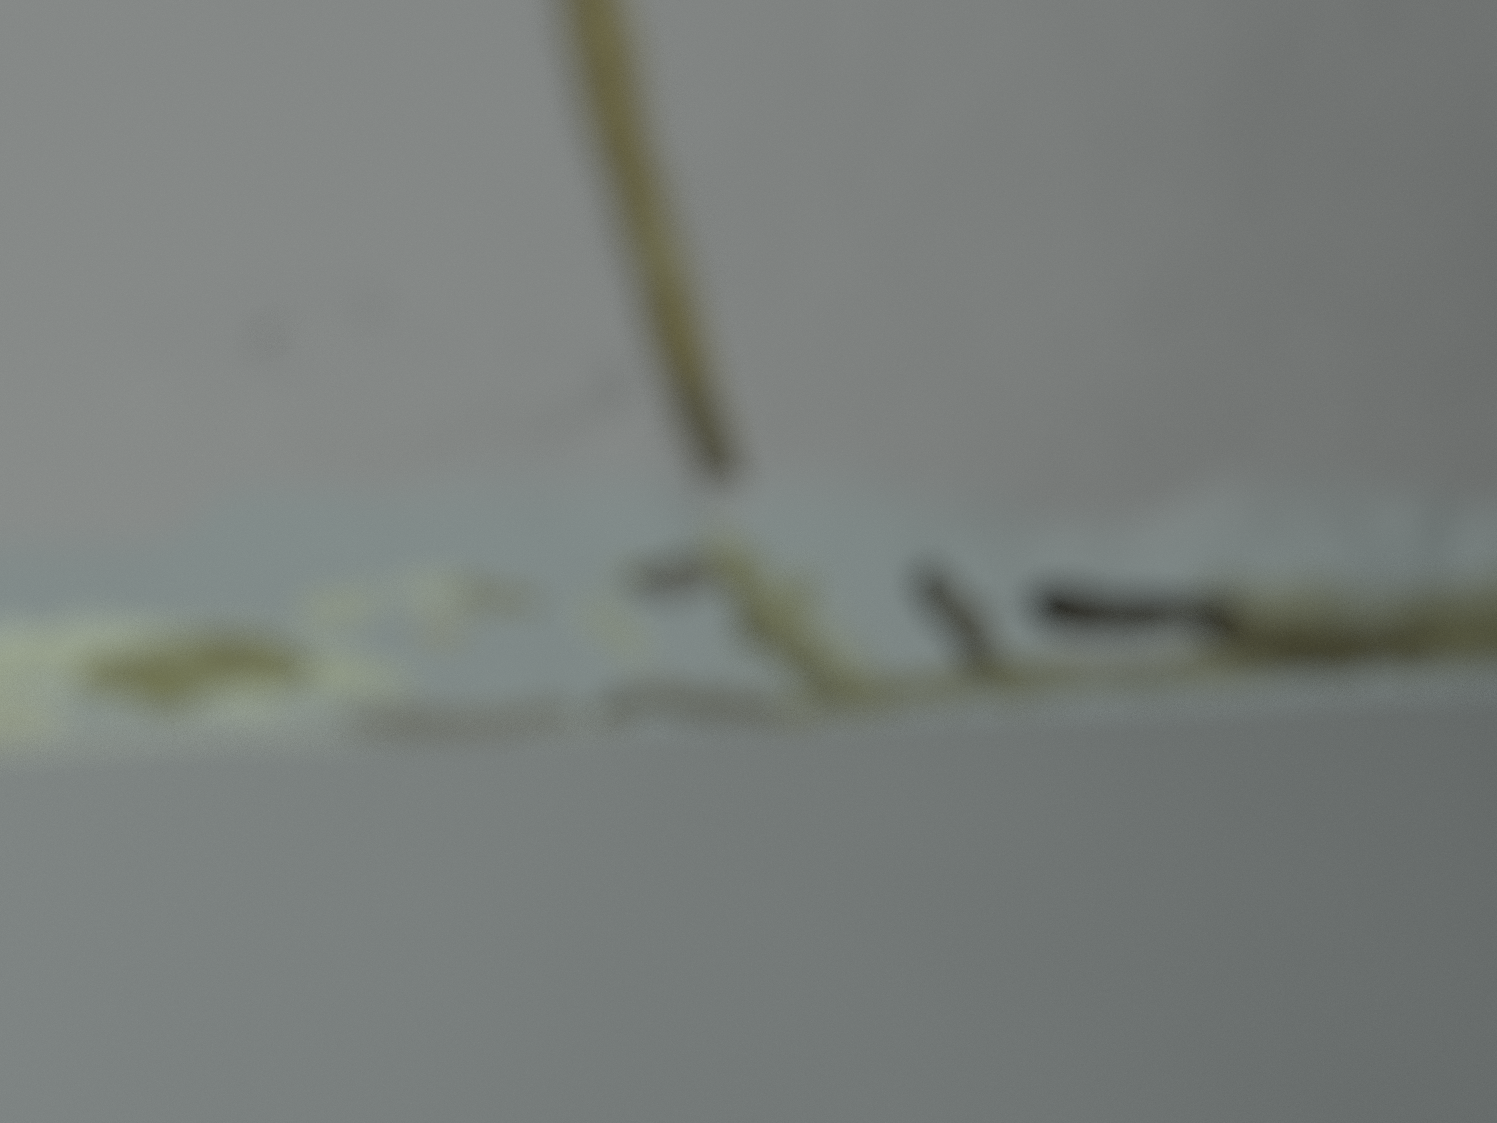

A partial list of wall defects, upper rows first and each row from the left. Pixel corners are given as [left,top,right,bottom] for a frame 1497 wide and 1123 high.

crack [566,0,741,491]
water stain [0,632,400,710]
spalling [617,549,761,599]
crack [713,526,877,716]
spalling [917,567,1015,689]
spalling [1036,586,1246,638]